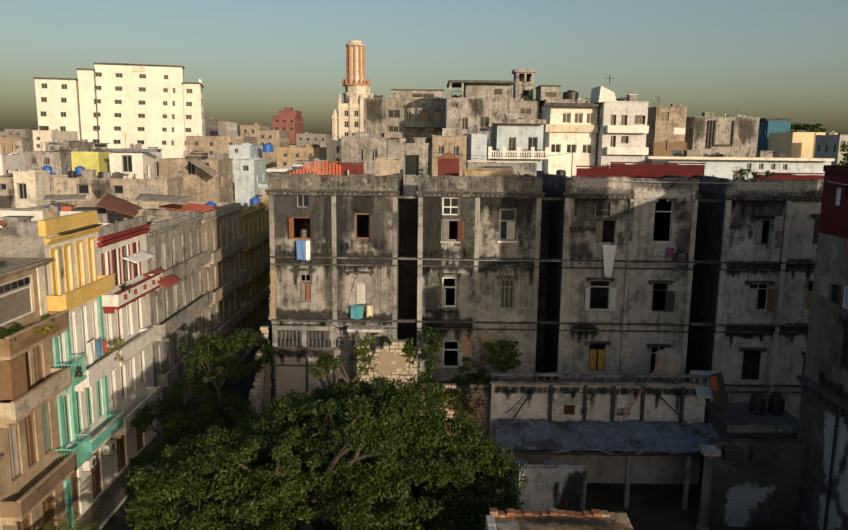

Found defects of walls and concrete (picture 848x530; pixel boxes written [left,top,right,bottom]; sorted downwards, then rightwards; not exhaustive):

peeling [724,483,775,527]
peeling [818,412,848,530]